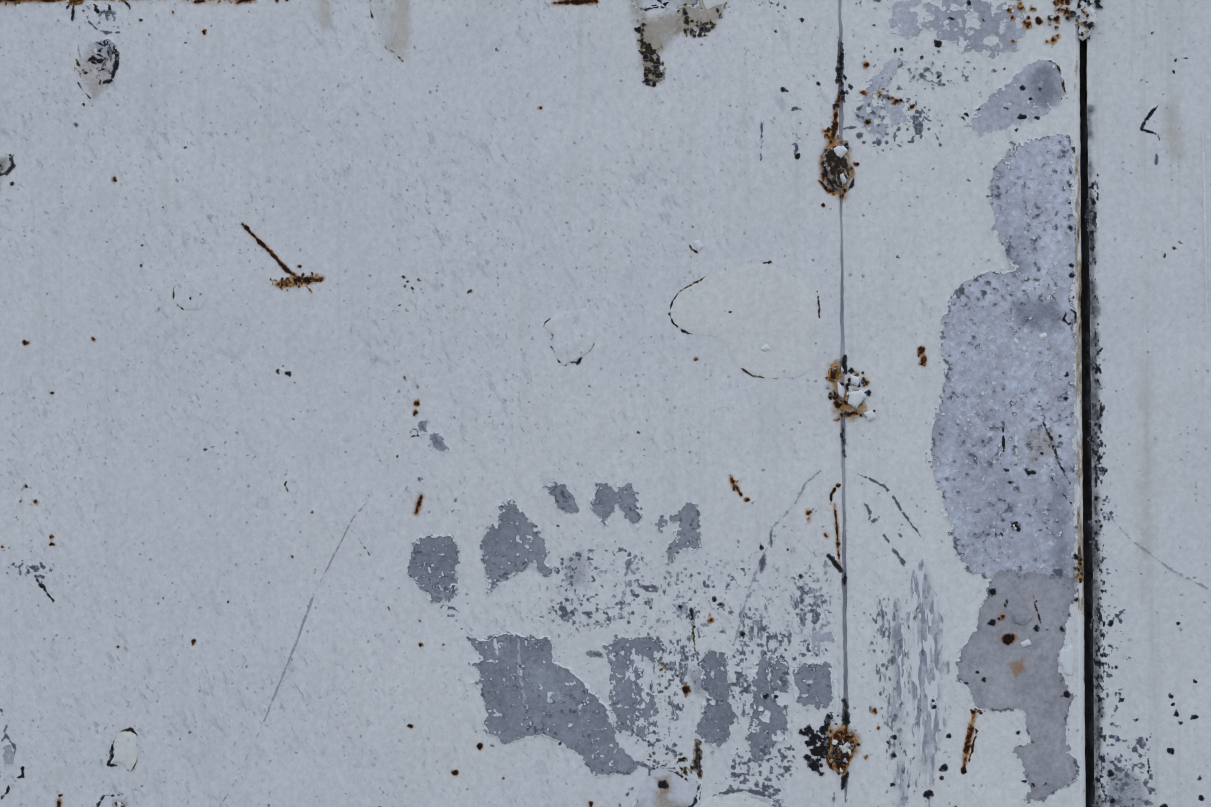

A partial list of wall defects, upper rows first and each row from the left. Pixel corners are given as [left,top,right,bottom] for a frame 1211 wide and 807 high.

rust [0,0,84,21]
peeling [74,4,120,106]
peeling [630,0,728,87]
peeling [0,154,16,186]
rust [818,94,859,207]
rust [241,223,324,293]
rust [825,354,876,458]
peeling [843,0,1081,807]
peeling [406,482,839,807]
peeling [0,708,25,800]
rust [798,697,868,803]
rust [961,708,983,775]